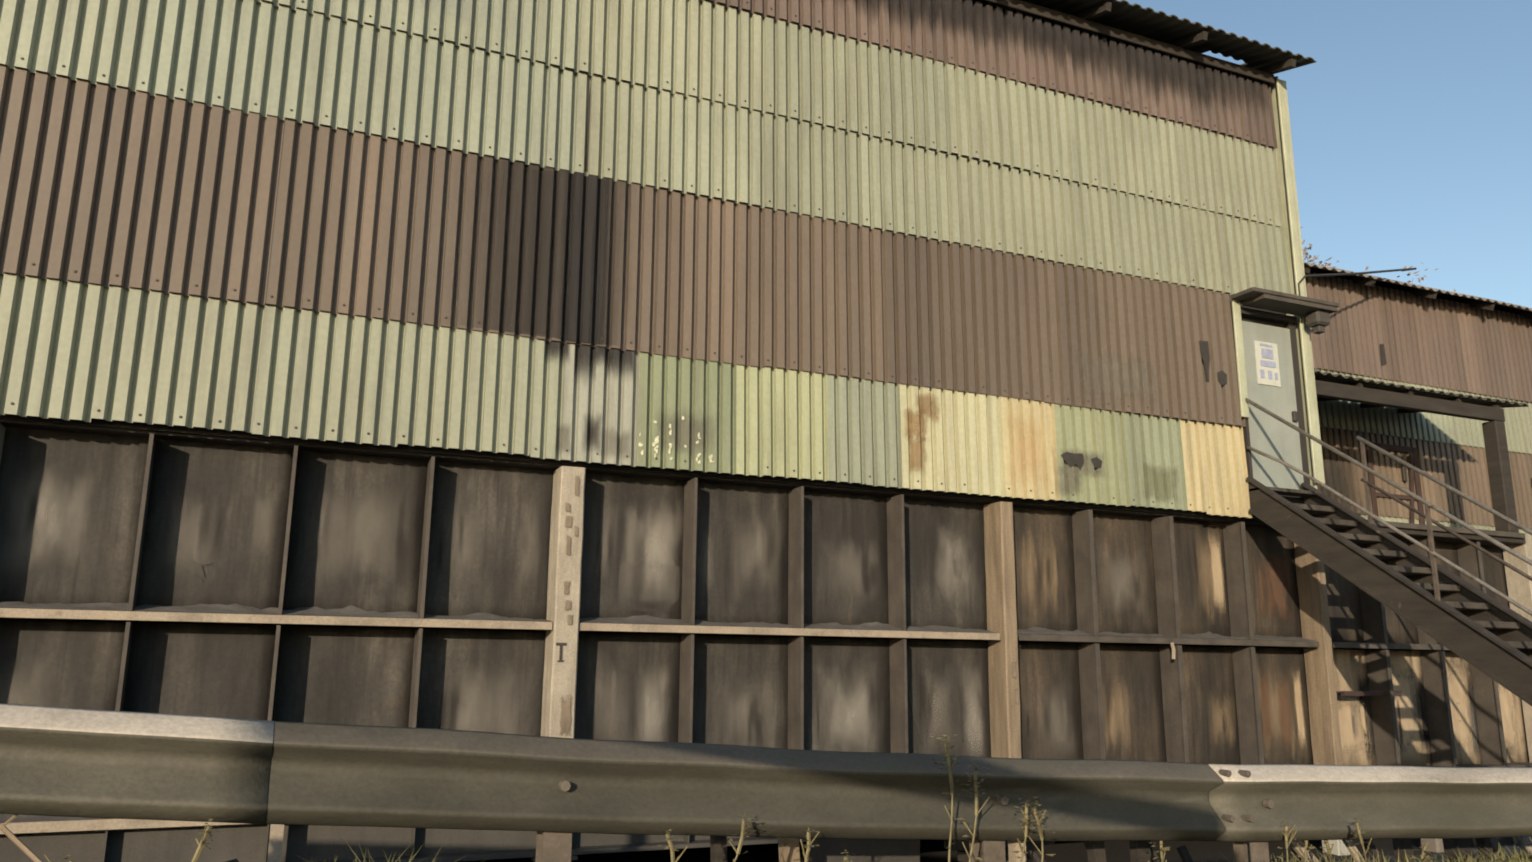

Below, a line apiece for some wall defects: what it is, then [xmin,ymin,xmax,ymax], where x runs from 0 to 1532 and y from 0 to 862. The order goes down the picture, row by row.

leakage [528,169,633,370]
leakage [587,422,598,443]
corrosion [908,397,936,468]
corrosion [1259,557,1287,614]
corrosion [1261,679,1305,743]